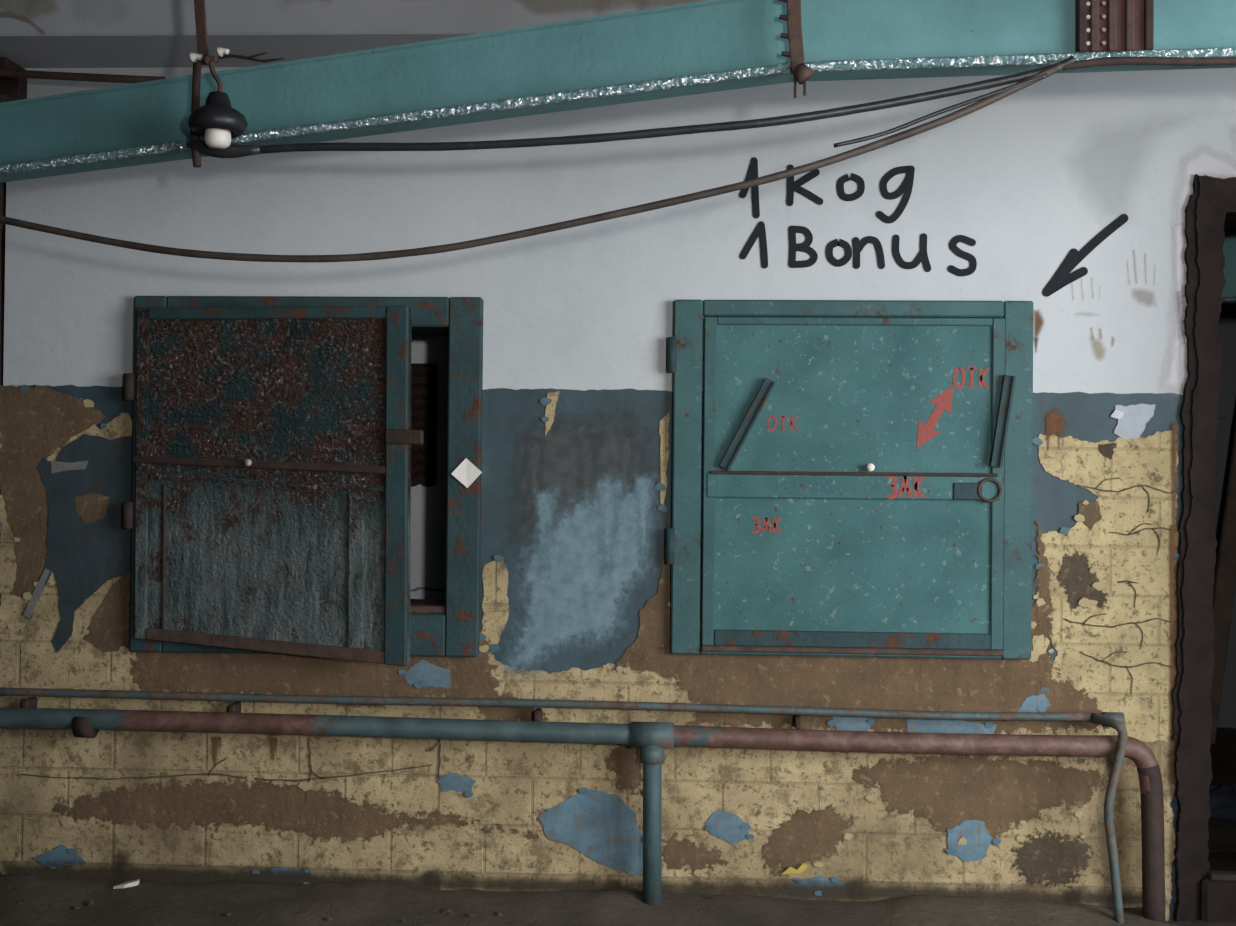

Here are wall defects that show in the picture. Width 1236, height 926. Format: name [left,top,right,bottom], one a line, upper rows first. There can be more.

crack [1079,478,1183,556]
flaking render [0,385,1180,921]
crack [1063,580,1178,694]